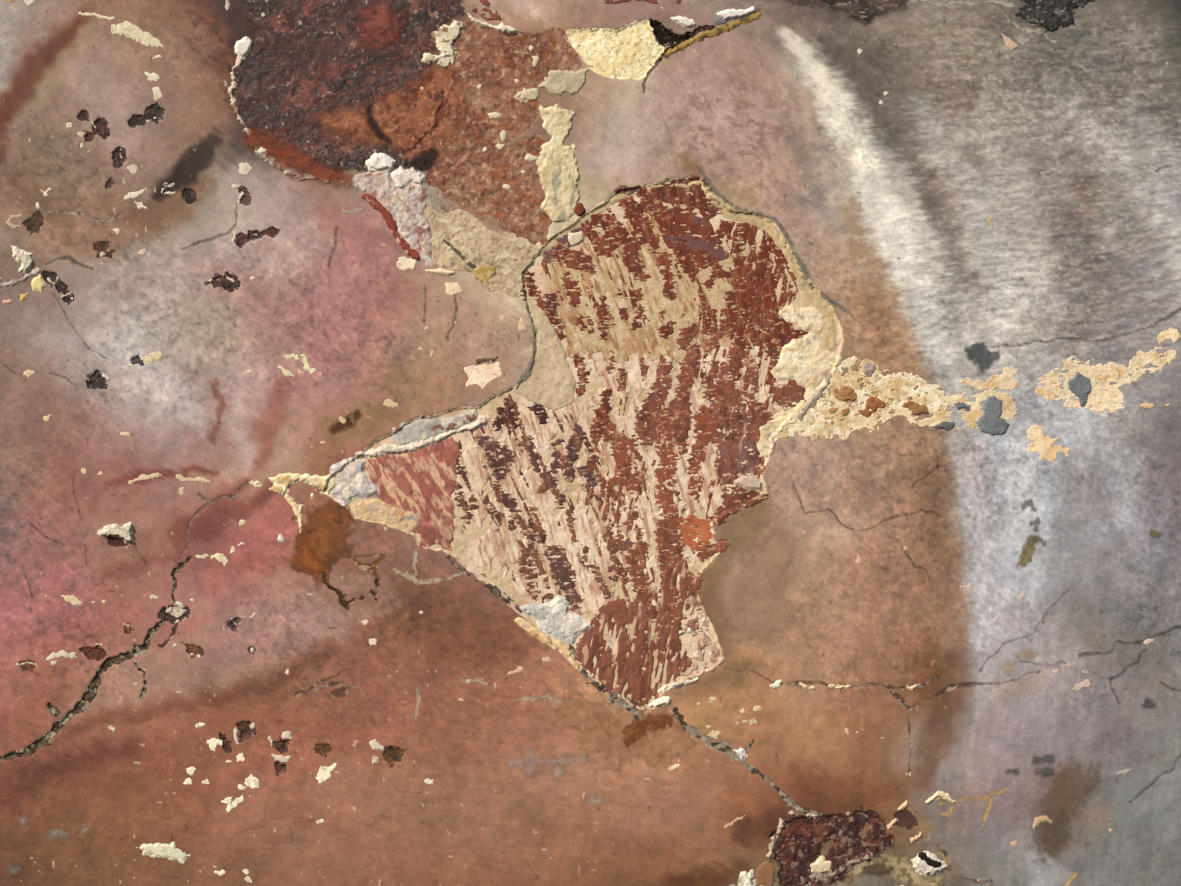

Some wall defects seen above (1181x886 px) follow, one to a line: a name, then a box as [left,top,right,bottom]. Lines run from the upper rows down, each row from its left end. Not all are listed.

peeling [205,269,256,293]
flaking render [227,0,1019,715]
peeling [1035,328,1181,413]
peeling [1026,425,1071,462]
peeling [195,542,244,566]
rust [290,502,354,583]
crack [0,482,249,762]
crack [607,696,641,720]
peeling [740,706,762,725]
crack [673,707,823,819]
crack [938,786,1008,828]
crack [928,846,995,886]